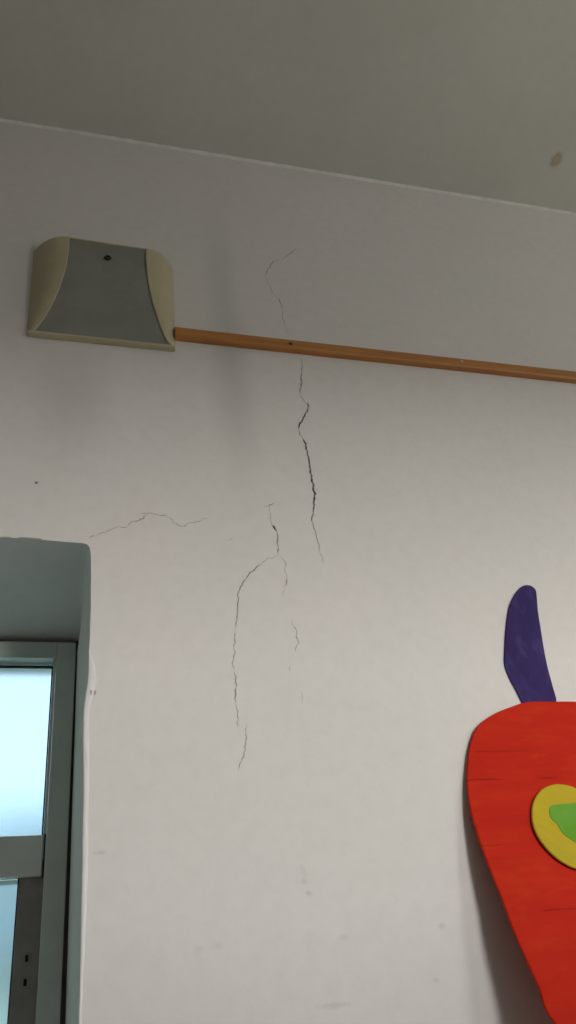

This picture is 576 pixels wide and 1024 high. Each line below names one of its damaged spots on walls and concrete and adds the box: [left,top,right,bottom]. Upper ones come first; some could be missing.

crack [298,359,320,546]
crack [236,504,279,618]